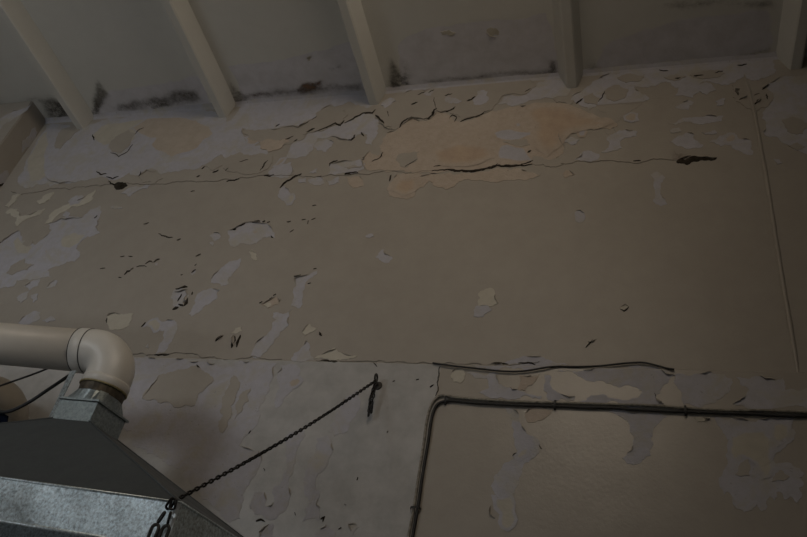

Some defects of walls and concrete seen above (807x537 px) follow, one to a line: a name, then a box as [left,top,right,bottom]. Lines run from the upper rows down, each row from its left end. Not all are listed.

leakage [90,73,211,114]
leakage [226,41,364,102]
crack [11,160,533,195]
peeling [0,79,618,303]
crack [561,157,669,165]
flaking render [676,155,717,165]
peeling [122,258,318,537]
peeling [451,356,807,512]